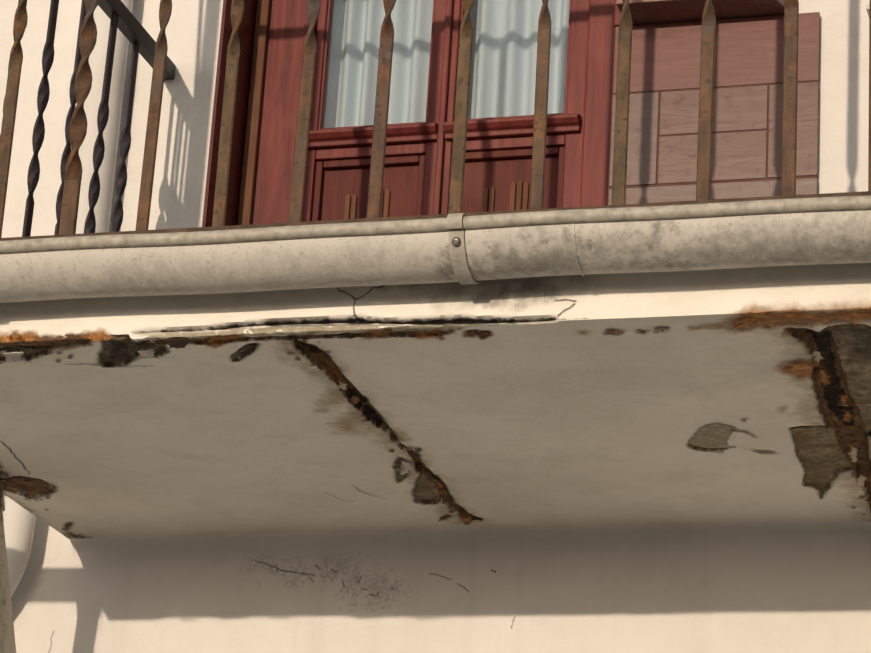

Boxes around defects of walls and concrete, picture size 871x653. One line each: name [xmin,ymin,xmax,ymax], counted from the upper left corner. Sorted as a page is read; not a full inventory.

corrosion [690,307,871,332]
spalling [0,325,385,368]
spalling [820,324,871,436]
crack [135,285,589,525]
peeling [687,419,757,453]
peeling [0,467,58,513]